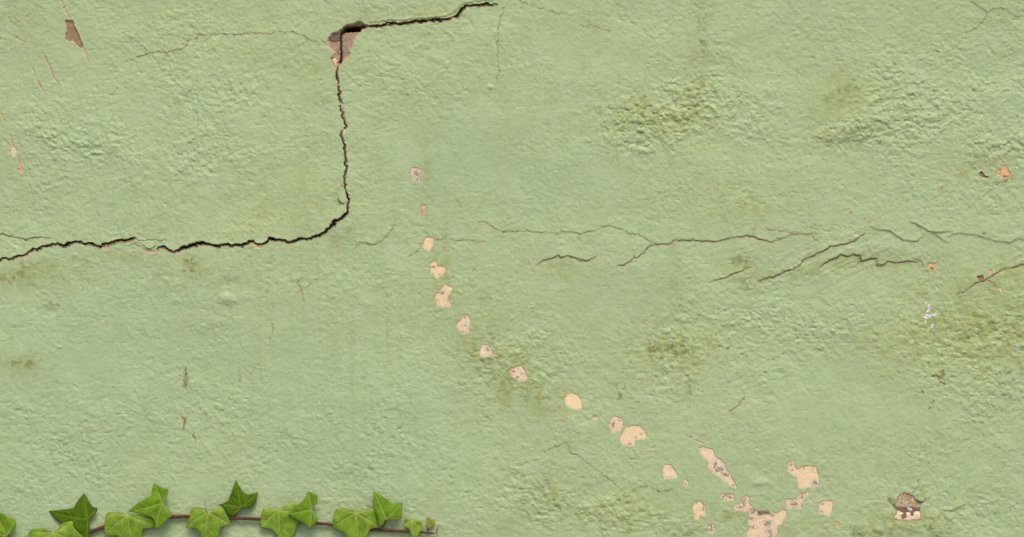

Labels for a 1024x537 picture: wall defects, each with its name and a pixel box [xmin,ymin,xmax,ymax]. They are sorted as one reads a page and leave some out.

peeling [66,20,83,48]
crack [0,0,609,261]
peeling [421,237,453,307]
crack [408,221,1024,295]
peeling [456,315,470,334]
peeling [479,345,494,357]
peeling [509,366,528,381]
peeling [564,393,582,410]
peeling [592,416,656,450]
peeling [692,500,715,533]
peeling [699,446,819,537]
peeling [888,488,926,521]